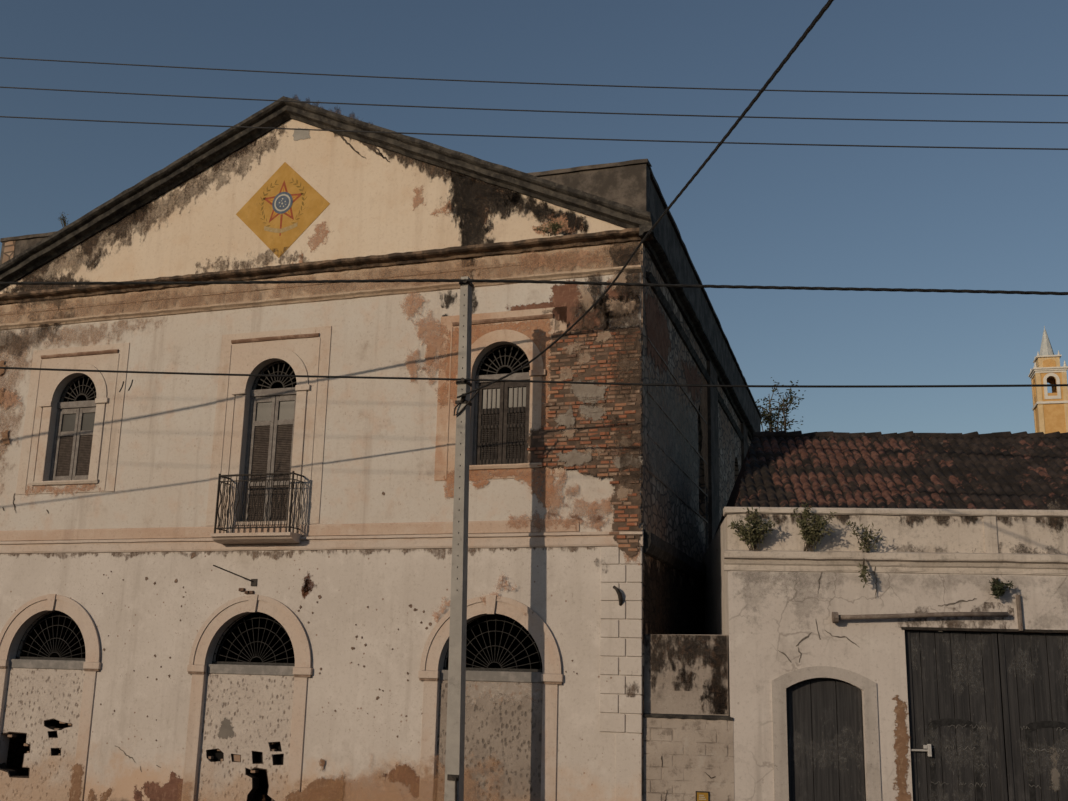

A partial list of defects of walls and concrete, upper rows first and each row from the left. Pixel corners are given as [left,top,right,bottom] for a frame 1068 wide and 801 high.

water stain [0,126,285,467]
water stain [272,143,641,400]
water stain [231,333,320,344]
flaking render [401,250,643,565]
water stain [899,515,978,527]
crack [938,598,976,606]
water stain [643,554,728,714]
crack [778,621,859,663]
spalling [44,718,72,756]
spalling [134,772,183,801]
spalling [206,742,344,801]
spalling [892,695,911,801]